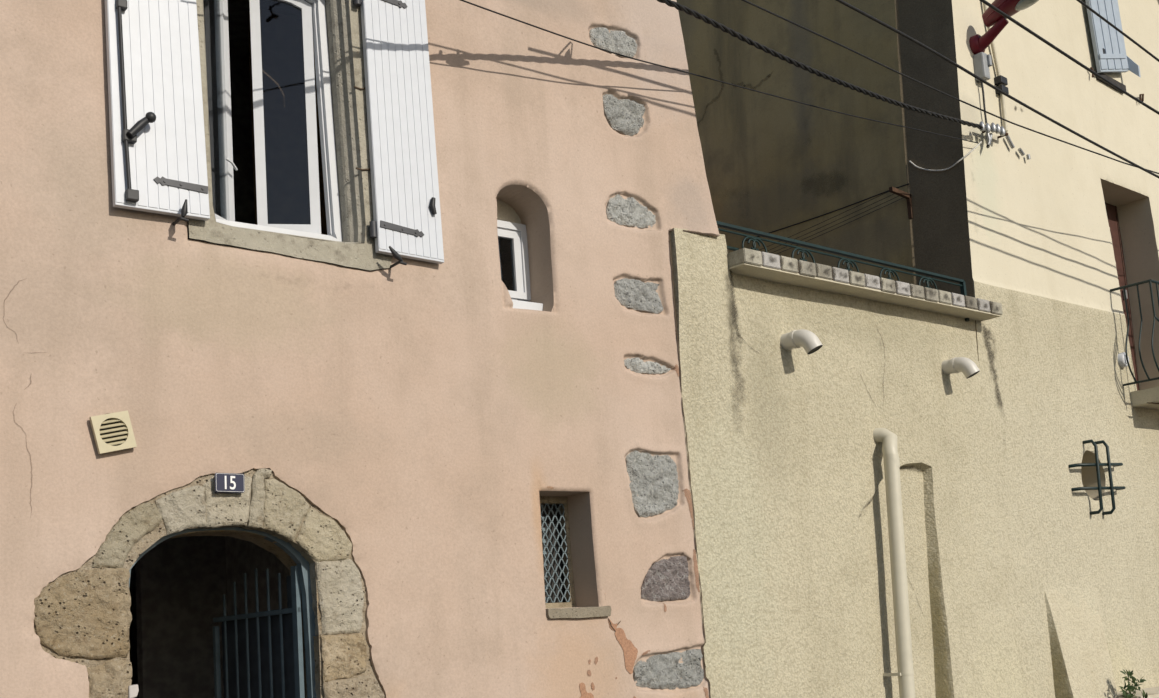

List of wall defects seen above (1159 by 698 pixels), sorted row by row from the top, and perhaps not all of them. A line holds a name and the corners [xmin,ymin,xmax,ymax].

damp [984,329,1002,406]
peeling [580,657,598,698]
flaking render [608,619,709,698]